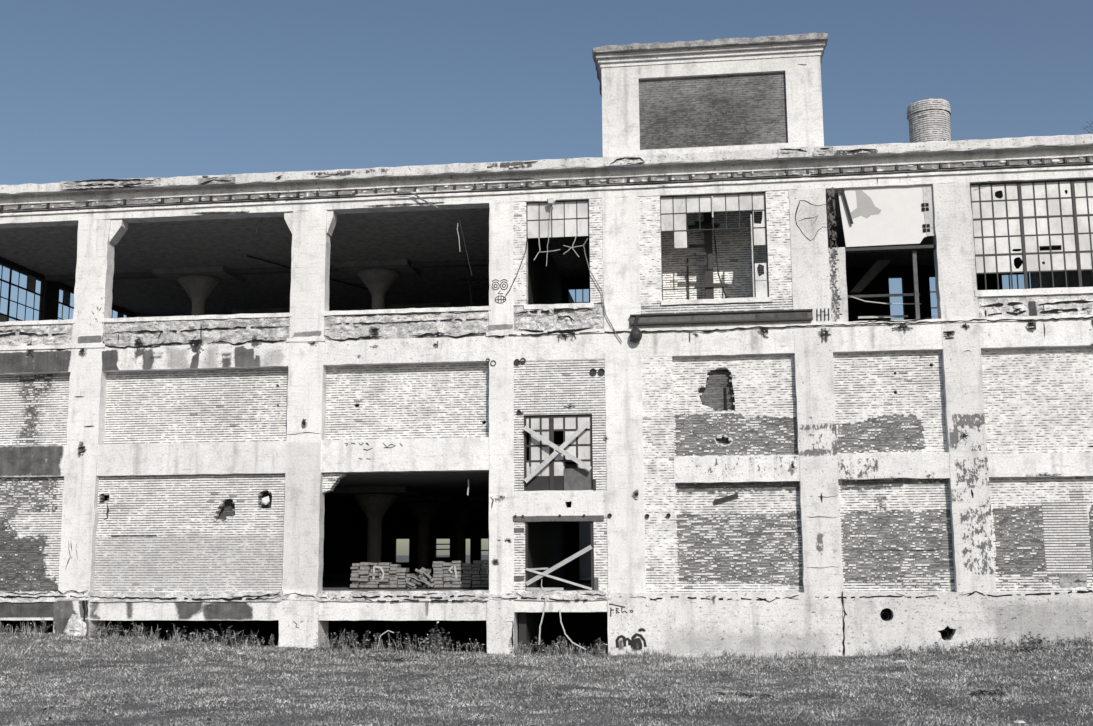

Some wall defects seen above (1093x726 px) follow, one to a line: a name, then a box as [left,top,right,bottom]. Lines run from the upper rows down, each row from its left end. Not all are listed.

spalling [979,298,1093,333]
water stain [135,348,161,370]
water stain [190,351,200,368]
water stain [222,346,260,367]
water stain [0,336,119,476]
peeling [675,367,1060,589]
crack [869,546,939,554]
water stain [176,601,253,620]
crack [633,589,1093,655]